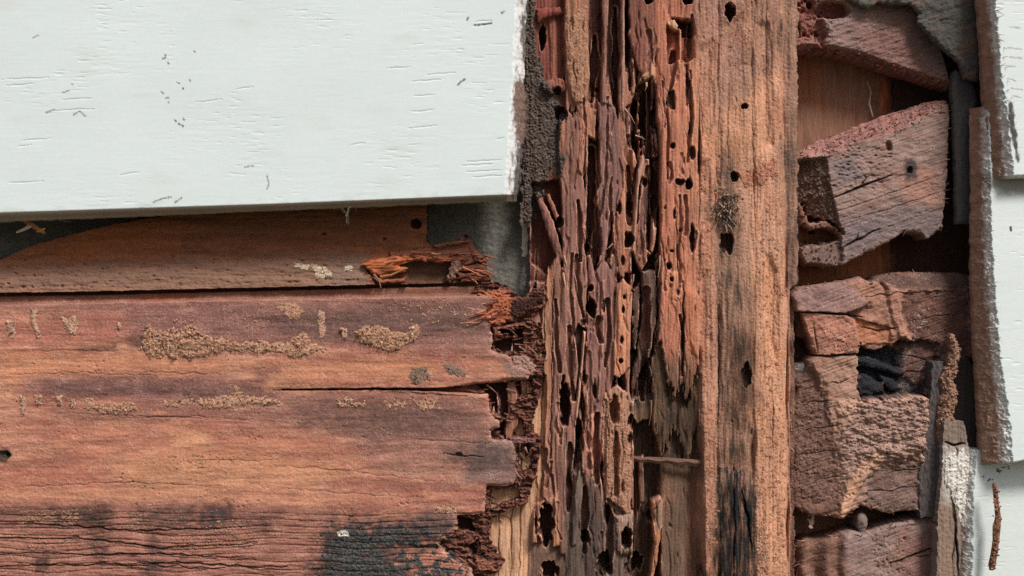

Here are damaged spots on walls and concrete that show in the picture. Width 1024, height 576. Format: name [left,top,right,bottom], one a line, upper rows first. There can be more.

peeling [344,255,408,276]
peeling [444,364,466,377]
crack [273,387,452,395]
damp [312,515,469,576]